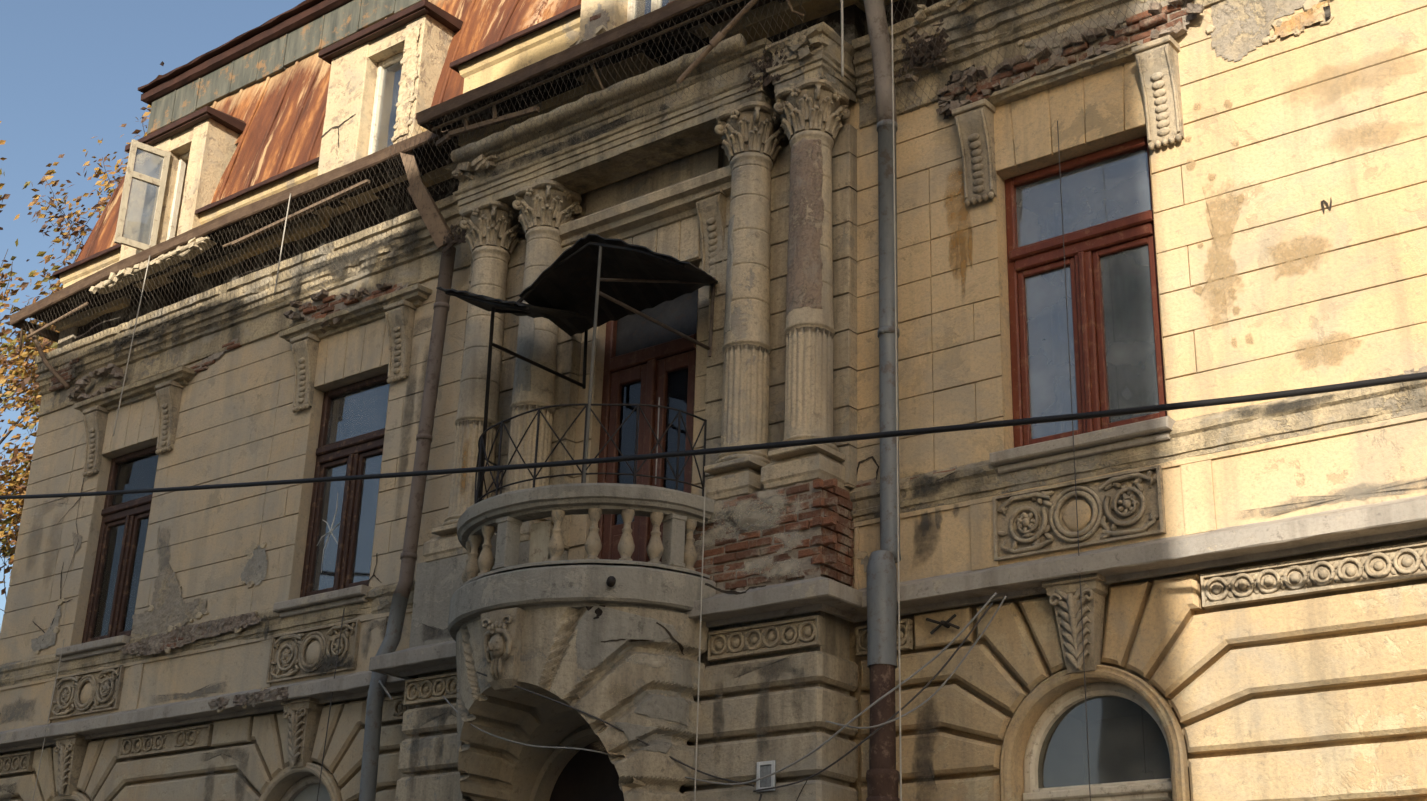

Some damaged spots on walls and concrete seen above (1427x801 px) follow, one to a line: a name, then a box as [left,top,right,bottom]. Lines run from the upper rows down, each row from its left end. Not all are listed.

flaking render [905,0,1334,120]
flaking render [283,282,408,334]
flaking render [685,477,877,594]
flaking render [240,542,268,589]
flaking render [121,610,262,656]